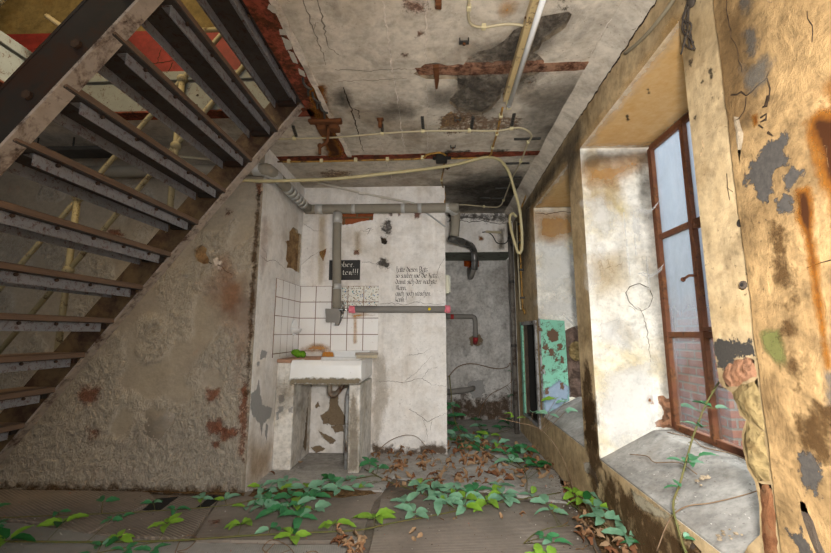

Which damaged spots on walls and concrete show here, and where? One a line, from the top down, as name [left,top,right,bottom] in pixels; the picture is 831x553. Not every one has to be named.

peeling [279,29,306,77]
crack [303,0,415,152]
peeling [742,130,806,214]
rust [807,110,831,198]
flaking render [286,228,299,272]
rust [795,187,831,369]
crack [625,283,653,362]
rust [76,384,101,404]
flaking render [205,380,293,463]
peeling [303,391,345,453]
flaking render [713,337,825,553]